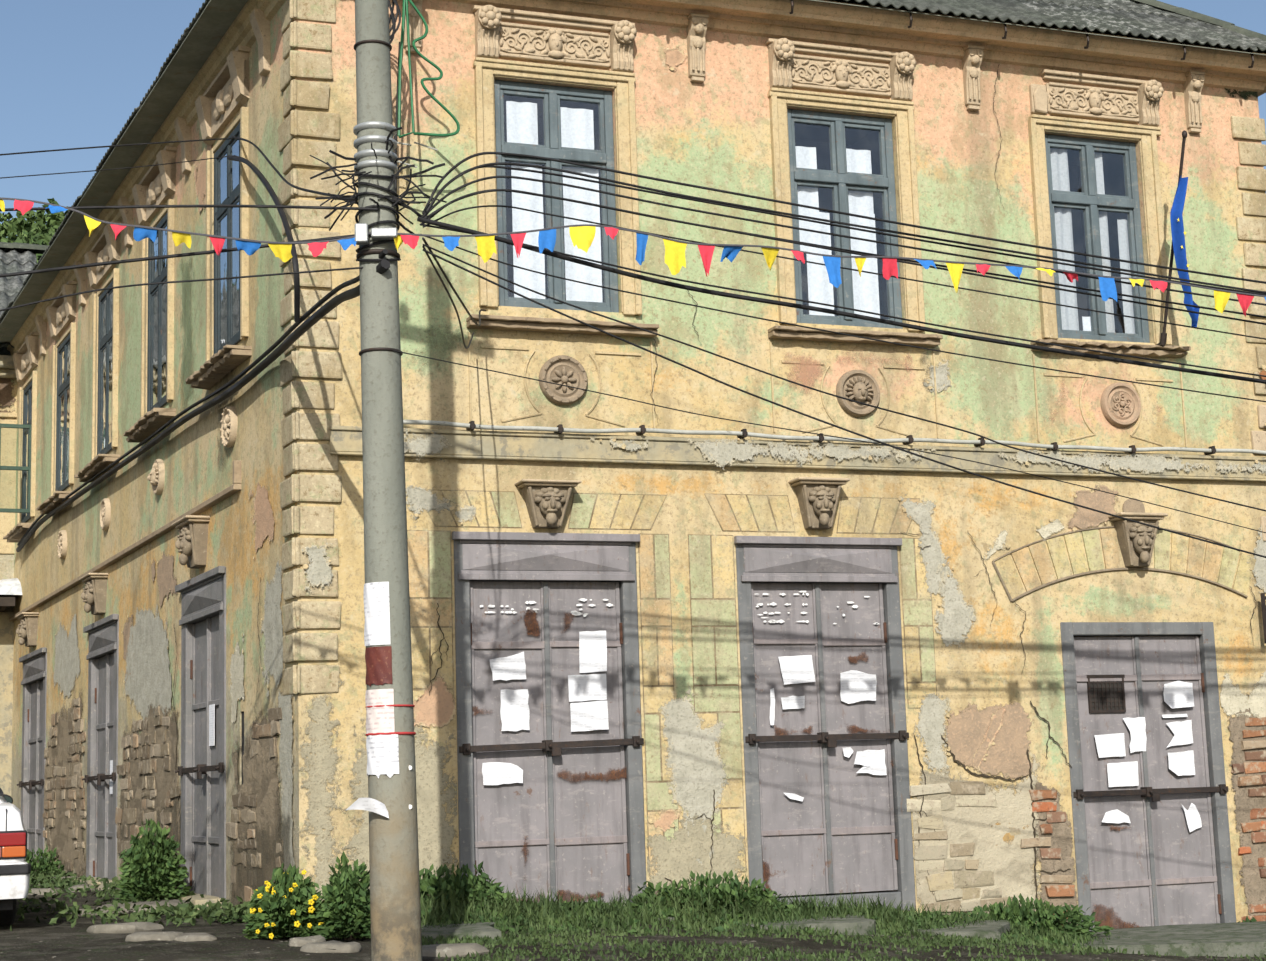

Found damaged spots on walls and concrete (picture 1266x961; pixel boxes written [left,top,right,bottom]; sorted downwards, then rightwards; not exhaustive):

crack [993,65,1004,208]
flaking render [687,437,936,470]
flaking render [261,559,370,901]
flaking render [413,675,458,892]
crack [429,603,449,696]
rust [524,609,540,637]
rust [557,768,627,782]
flaking render [647,687,749,902]
flaking render [898,494,976,647]
crack [914,533,1072,899]
flaking render [914,692,1078,926]
flaking render [1220,671,1266,922]